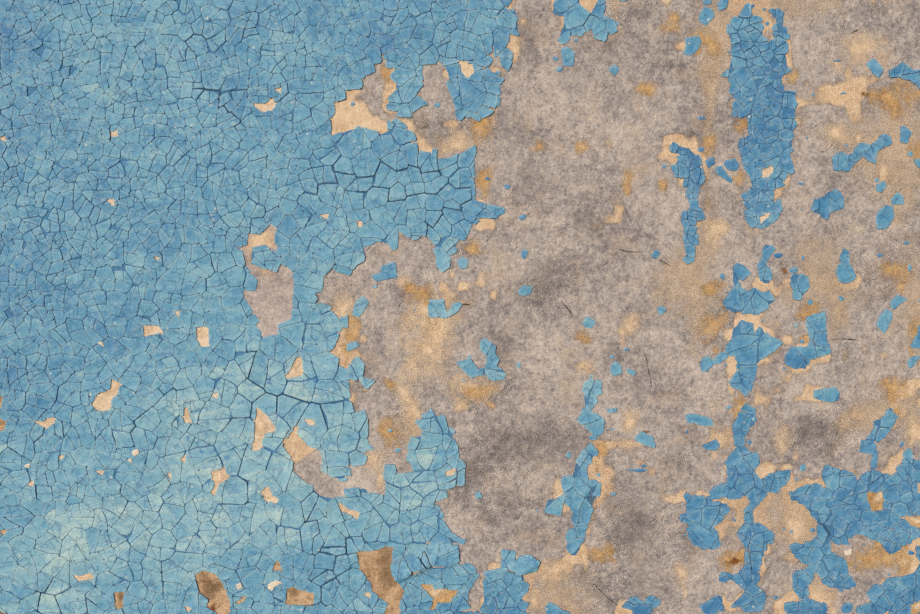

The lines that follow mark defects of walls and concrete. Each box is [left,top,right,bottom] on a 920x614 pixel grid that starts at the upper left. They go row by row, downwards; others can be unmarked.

crack [553,0,617,36]
crack [619,147,702,266]
crack [700,5,808,386]
crack [0,0,524,614]
peeling [701,335,759,397]
crack [545,449,597,555]
peeling [679,470,743,534]
peeling [743,452,791,493]
crack [688,408,920,614]
peeling [716,488,920,614]
peeling [883,448,920,507]
peeling [699,595,722,614]